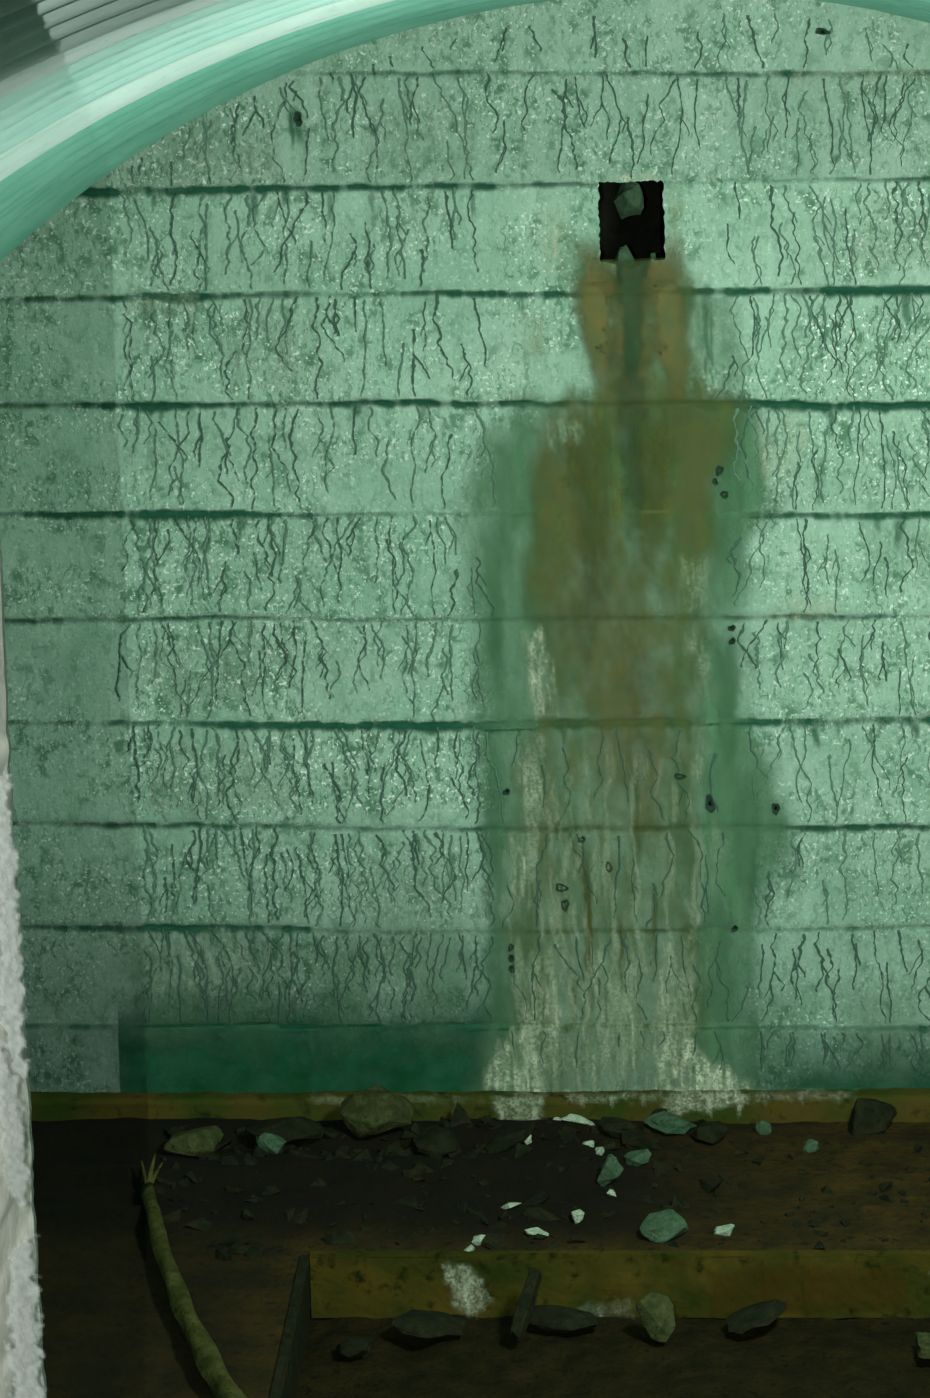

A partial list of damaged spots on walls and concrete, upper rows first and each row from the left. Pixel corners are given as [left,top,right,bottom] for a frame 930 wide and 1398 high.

crack [4,402,47,410]
crack [9,617,62,625]
crack [24,13,930,1074]
rust [527,260,736,1014]
damp [617,262,649,381]
damp [698,401,766,611]
damp [657,628,786,1108]